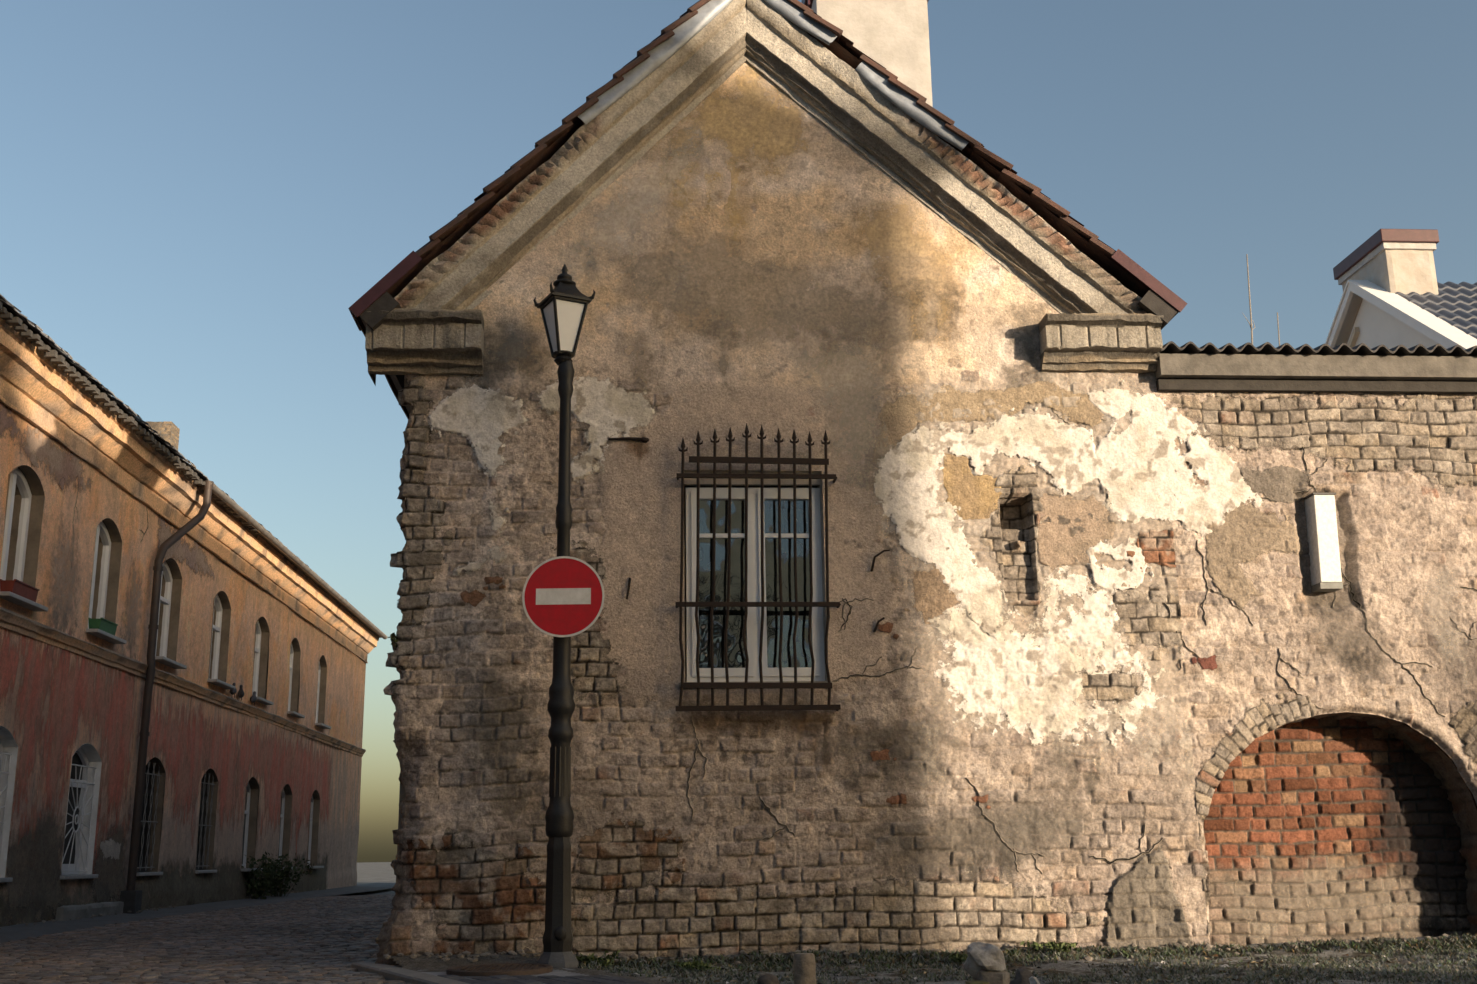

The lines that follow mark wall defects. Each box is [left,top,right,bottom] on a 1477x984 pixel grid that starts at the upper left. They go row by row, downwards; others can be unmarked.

spalling [157,518,215,578]
spalling [389,375,655,705]
peeling [870,380,1477,763]
crack [1332,568,1446,717]
crack [1449,586,1477,641]
peeling [138,694,331,854]
spalling [100,838,121,861]
spalling [399,827,546,955]
spalling [571,812,1101,958]